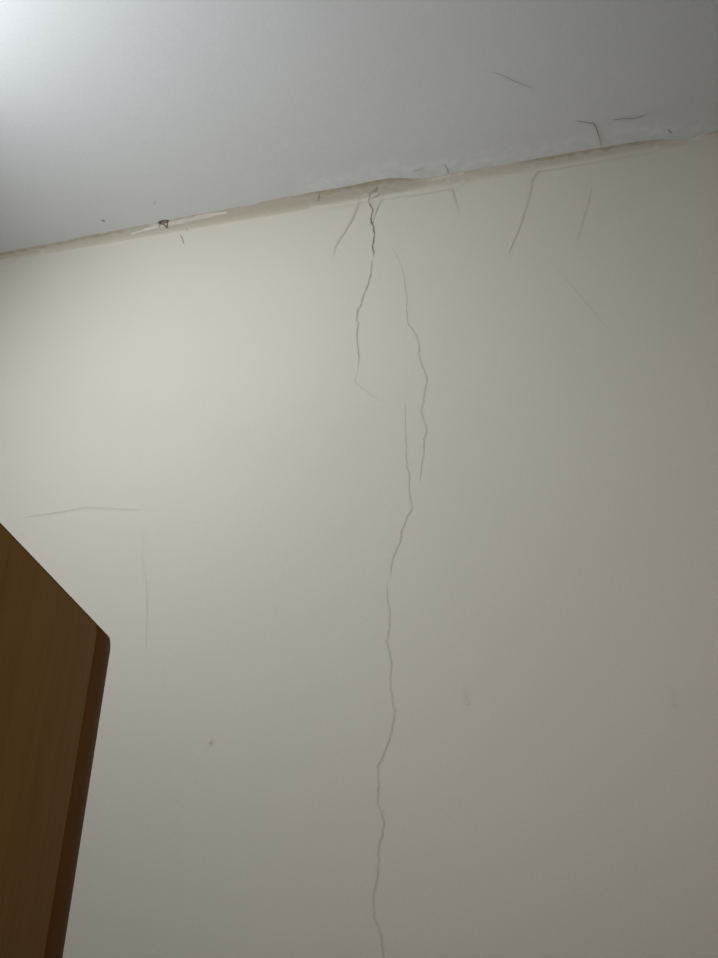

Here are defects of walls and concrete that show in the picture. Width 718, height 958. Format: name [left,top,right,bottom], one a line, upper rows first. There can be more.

crack [333,184,428,958]